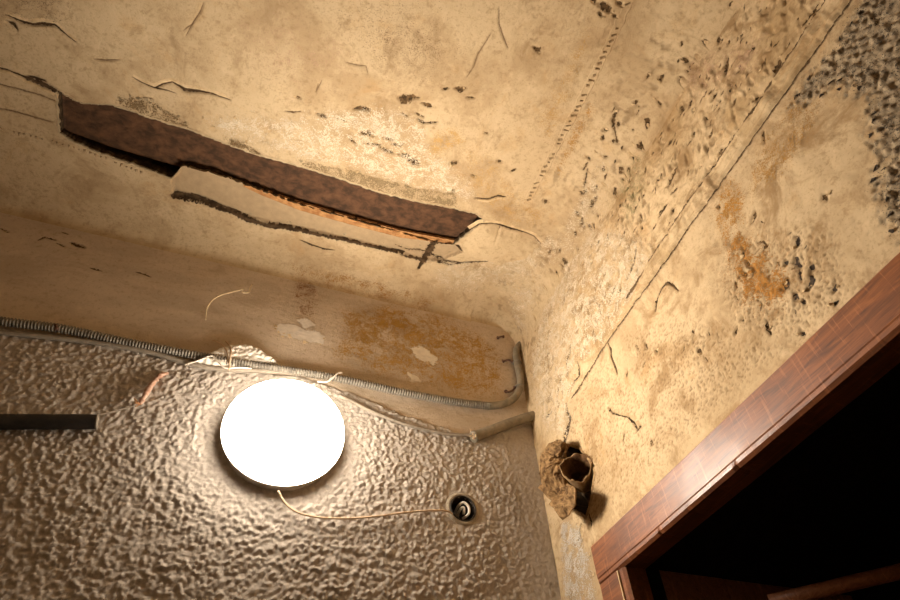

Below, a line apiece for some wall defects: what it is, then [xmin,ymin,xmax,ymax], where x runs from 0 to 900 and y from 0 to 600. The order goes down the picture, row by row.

crack [133,74,230,100]
peeling [673,40,790,154]
crack [171,191,543,269]
crack [546,0,852,443]
corrosion [709,92,835,319]
spalling [778,232,817,314]
spalling [54,89,695,600]
damp [329,302,507,399]